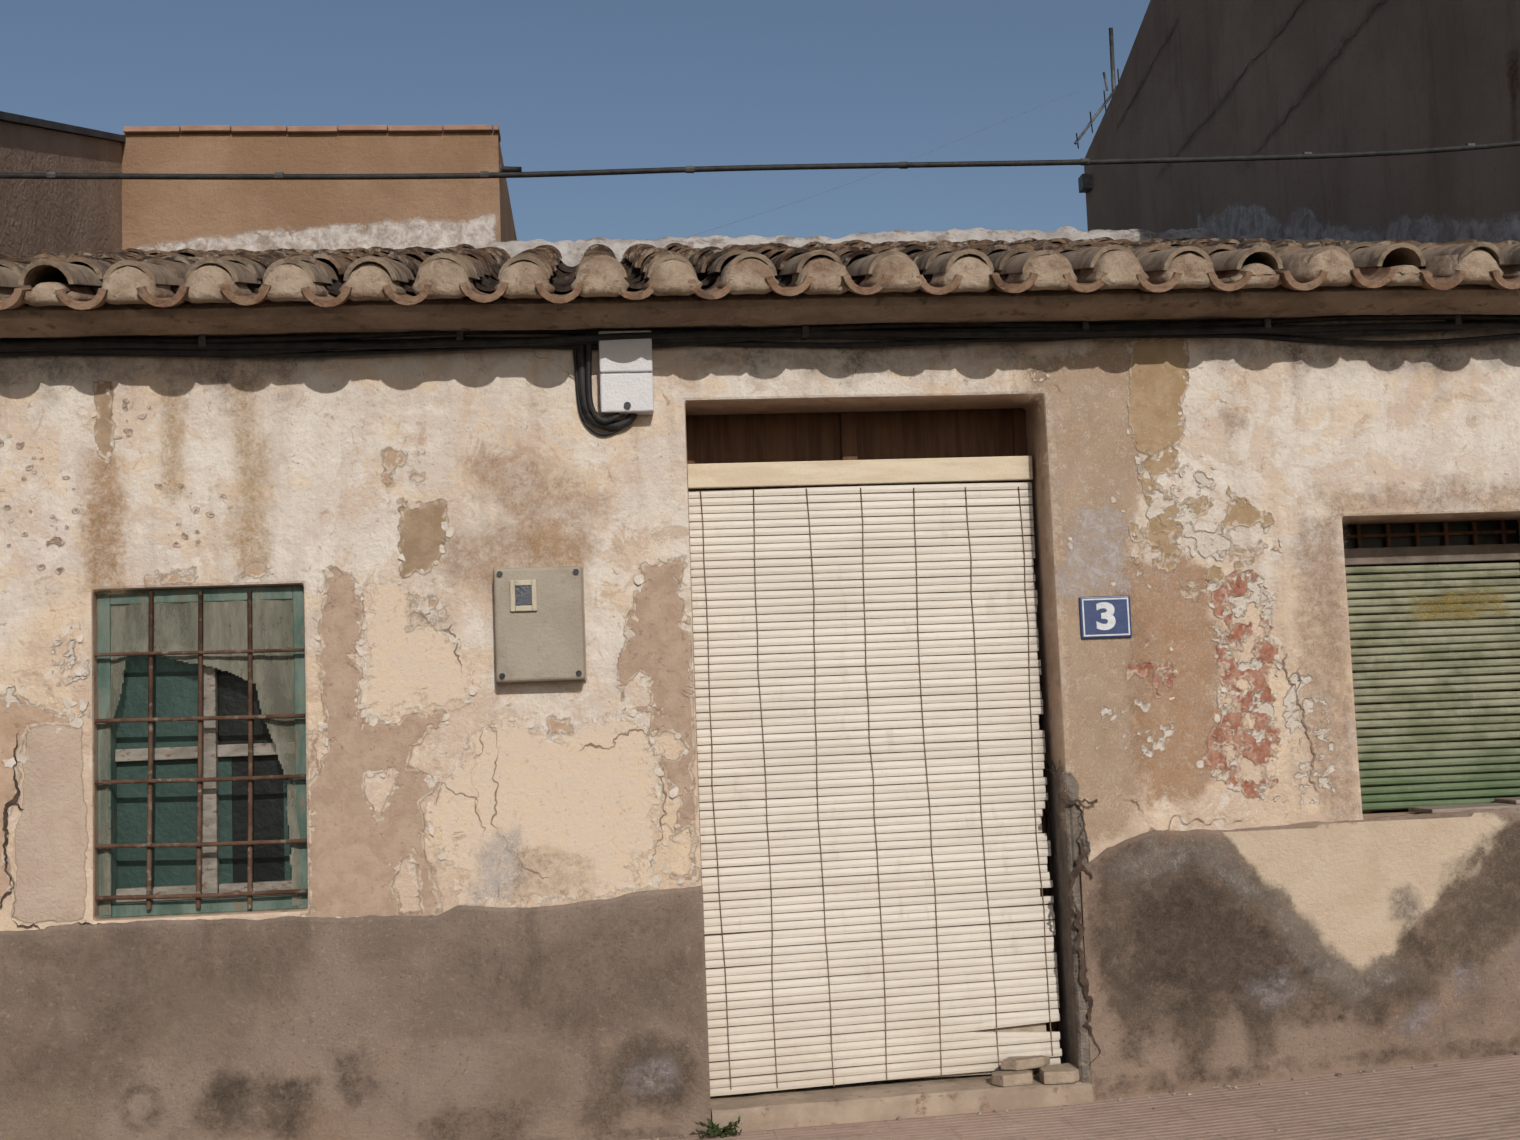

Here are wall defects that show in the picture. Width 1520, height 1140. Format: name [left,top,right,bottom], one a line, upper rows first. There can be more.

peeling [0,435,43,480]
peeling [46,508,79,546]
peeling [301,447,701,918]
crack [0,733,131,930]
crack [426,724,553,898]
crack [581,729,675,872]
leakage [1094,823,1520,1078]